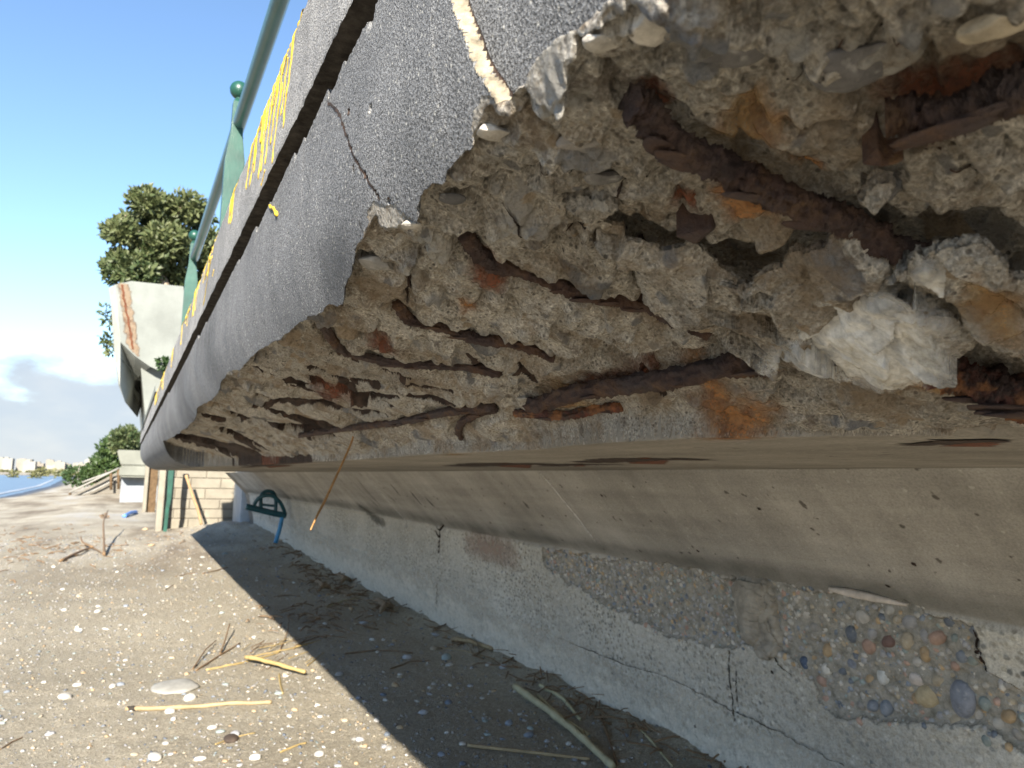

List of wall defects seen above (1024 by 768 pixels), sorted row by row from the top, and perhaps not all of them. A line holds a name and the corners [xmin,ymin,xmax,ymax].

crack [327,102,380,201]
spalling [165,0,1024,466]
rust [713,186,765,219]
rust [117,283,140,357]
rust [370,331,393,353]
rust [314,378,352,403]
rust [700,381,776,440]
rust [241,454,312,468]
rust [448,454,717,468]
peeling [542,548,753,650]
crack [558,638,844,766]
peeling [768,579,1024,752]